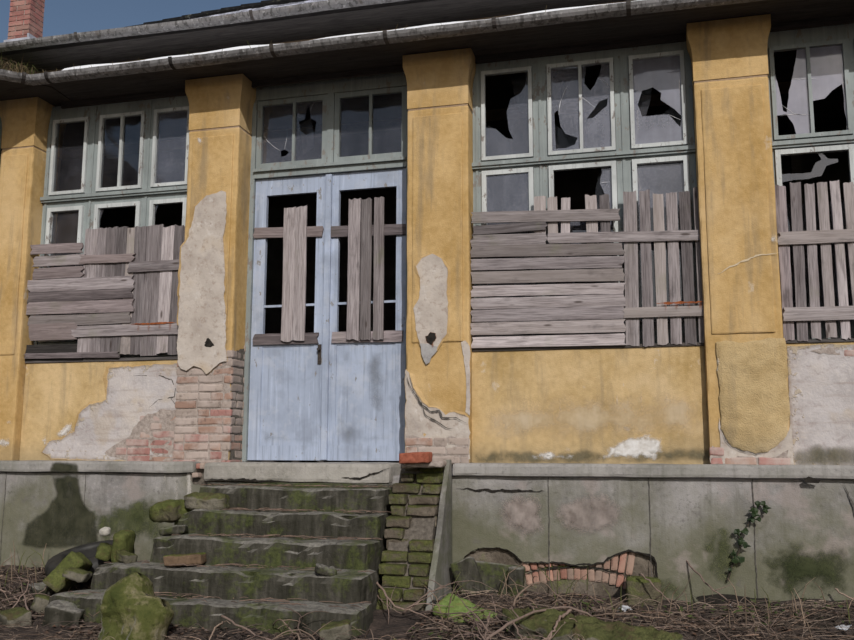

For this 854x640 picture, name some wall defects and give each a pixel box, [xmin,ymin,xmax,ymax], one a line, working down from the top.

flaking render [41,190,246,485]
flaking render [413,253,451,351]
crack [718,252,779,274]
flaking render [400,341,471,469]
flaking render [709,344,854,465]
crack [459,486,543,494]
spalling [464,547,658,597]